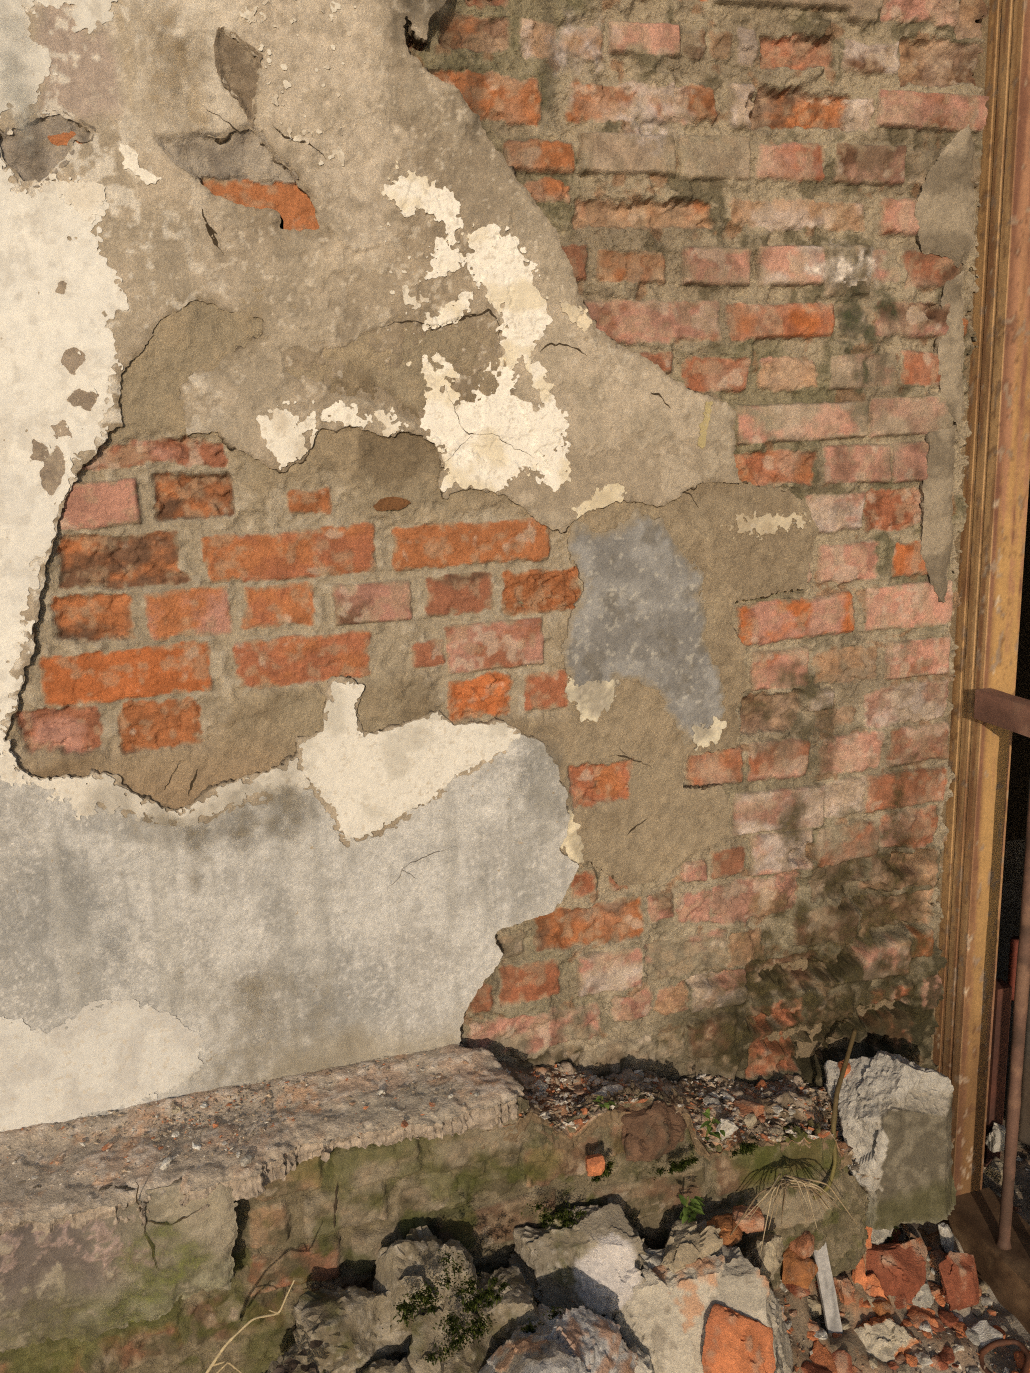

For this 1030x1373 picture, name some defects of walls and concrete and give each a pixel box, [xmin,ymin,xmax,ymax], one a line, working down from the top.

flaking render [0,0,990,1142]
crack [136,1182,204,1271]